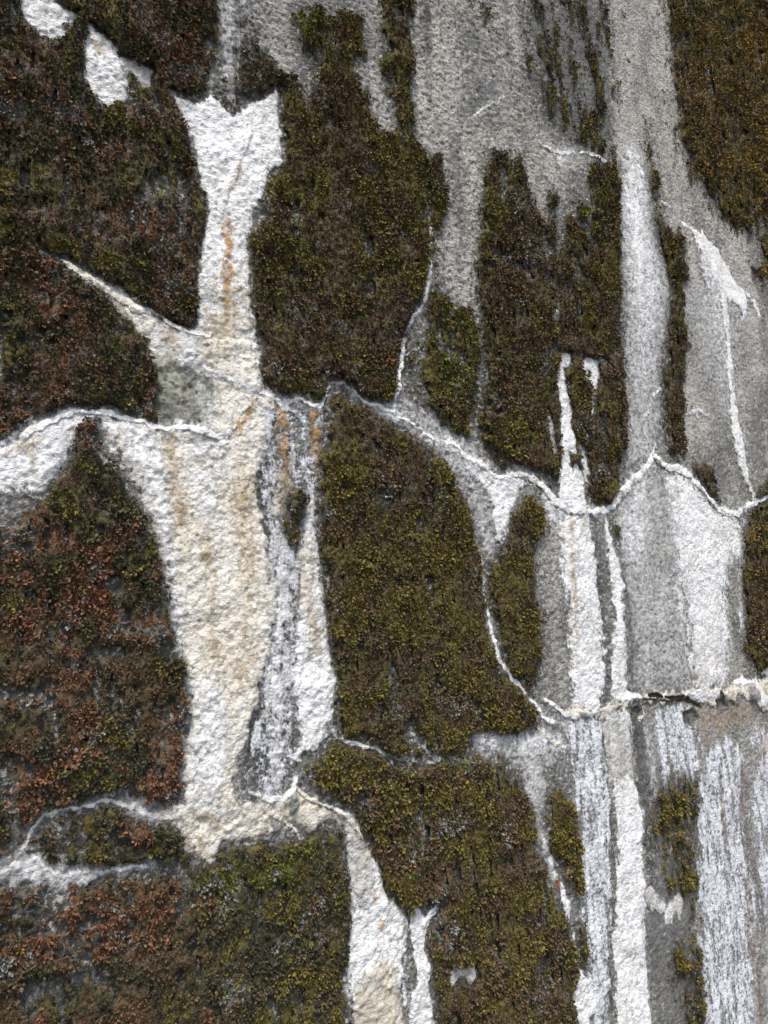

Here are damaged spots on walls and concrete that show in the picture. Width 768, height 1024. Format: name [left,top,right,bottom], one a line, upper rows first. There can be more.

rust [222,219,234,287]
crack [1,224,768,519]
damp [0,0,437,1024]
damp [374,0,768,1024]
crack [479,549,578,749]
crack [325,718,446,765]
crack [637,698,690,722]
crack [0,790,188,891]
crack [248,755,364,840]